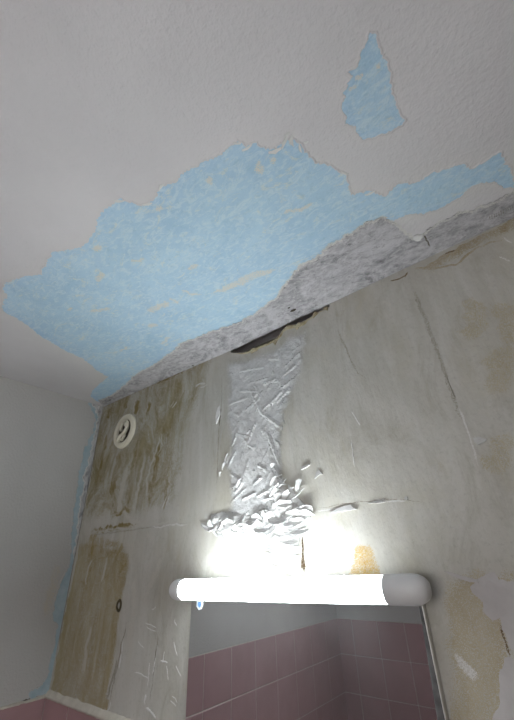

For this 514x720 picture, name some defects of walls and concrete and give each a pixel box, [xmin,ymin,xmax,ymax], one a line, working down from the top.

peeling [339,30,408,142]
peeling [0,132,514,699]
crack [414,292,478,465]
leakage [51,360,211,710]
corrosion [349,544,380,575]